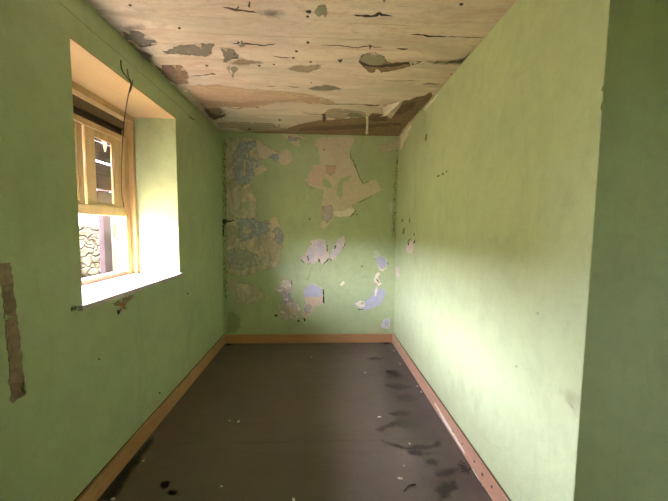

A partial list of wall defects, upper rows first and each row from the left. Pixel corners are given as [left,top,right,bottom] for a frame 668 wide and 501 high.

peeling [314,5,327,17]
peeling [123,31,158,48]
peeling [161,42,242,78]
peeling [155,65,438,277]
flaking render [113,295,133,315]
peeling [274,279,324,322]
peeling [354,249,388,310]
flaking render [0,262,27,403]